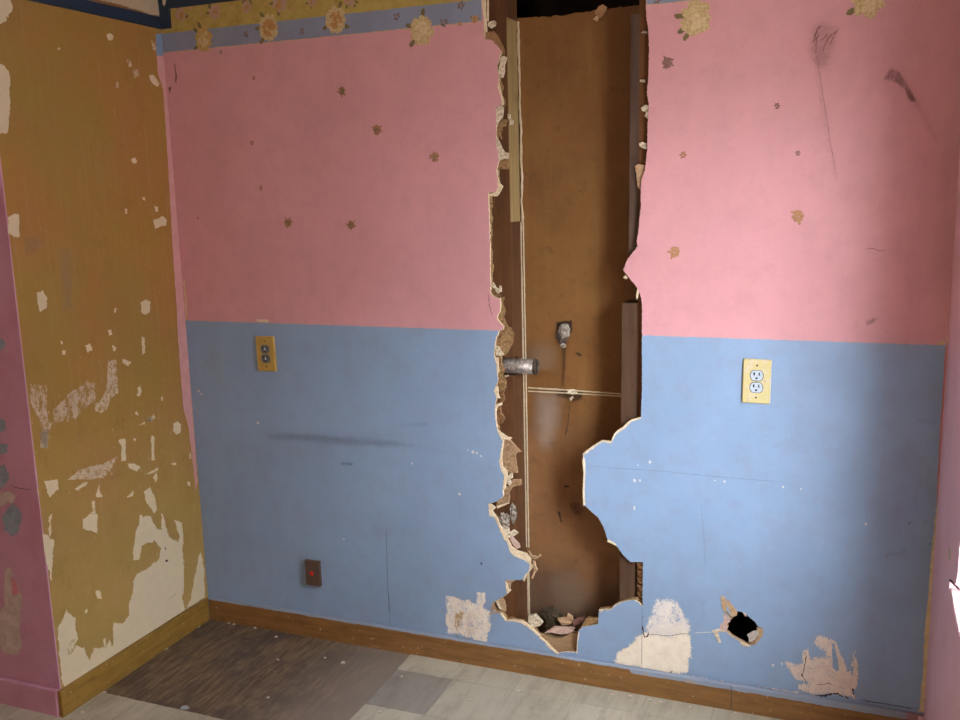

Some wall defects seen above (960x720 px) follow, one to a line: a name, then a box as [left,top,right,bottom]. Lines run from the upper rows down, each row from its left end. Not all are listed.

peeling [0,64,11,134]
peeling [127,60,160,87]
peeling [8,214,20,237]
peeling [142,197,167,229]
spalling [635,164,645,197]
spalling [481,0,643,654]
peeling [30,330,131,448]
peeling [0,419,22,536]
peeling [37,436,205,687]
spalling [712,596,763,647]